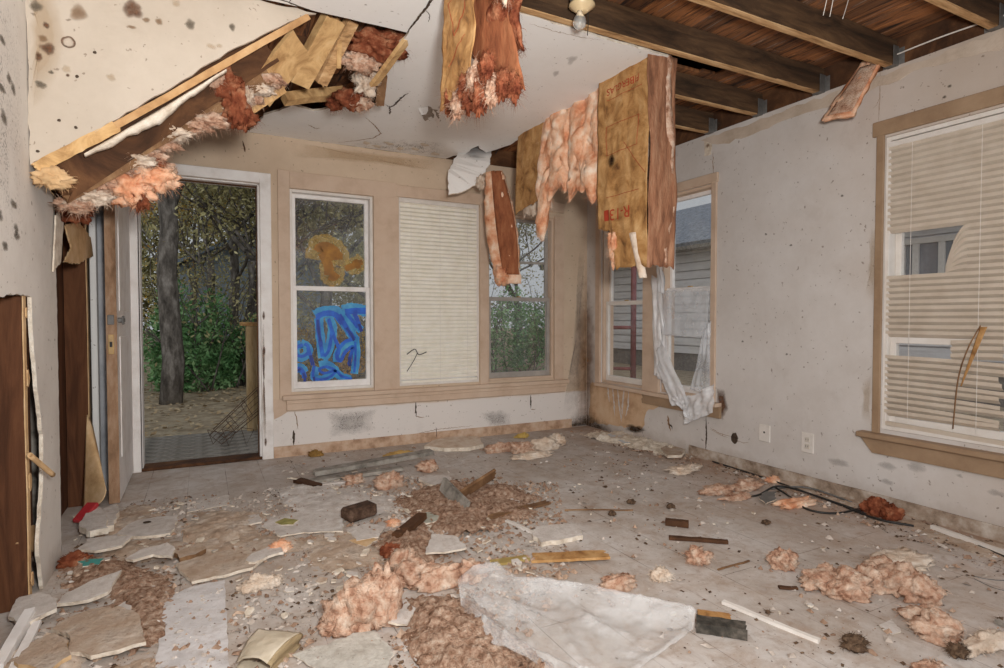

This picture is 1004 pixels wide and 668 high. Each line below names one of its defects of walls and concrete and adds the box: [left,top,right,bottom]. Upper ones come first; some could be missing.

leakage [124,1,161,28]
leakage [36,23,76,60]
flaking render [30,165,79,195]